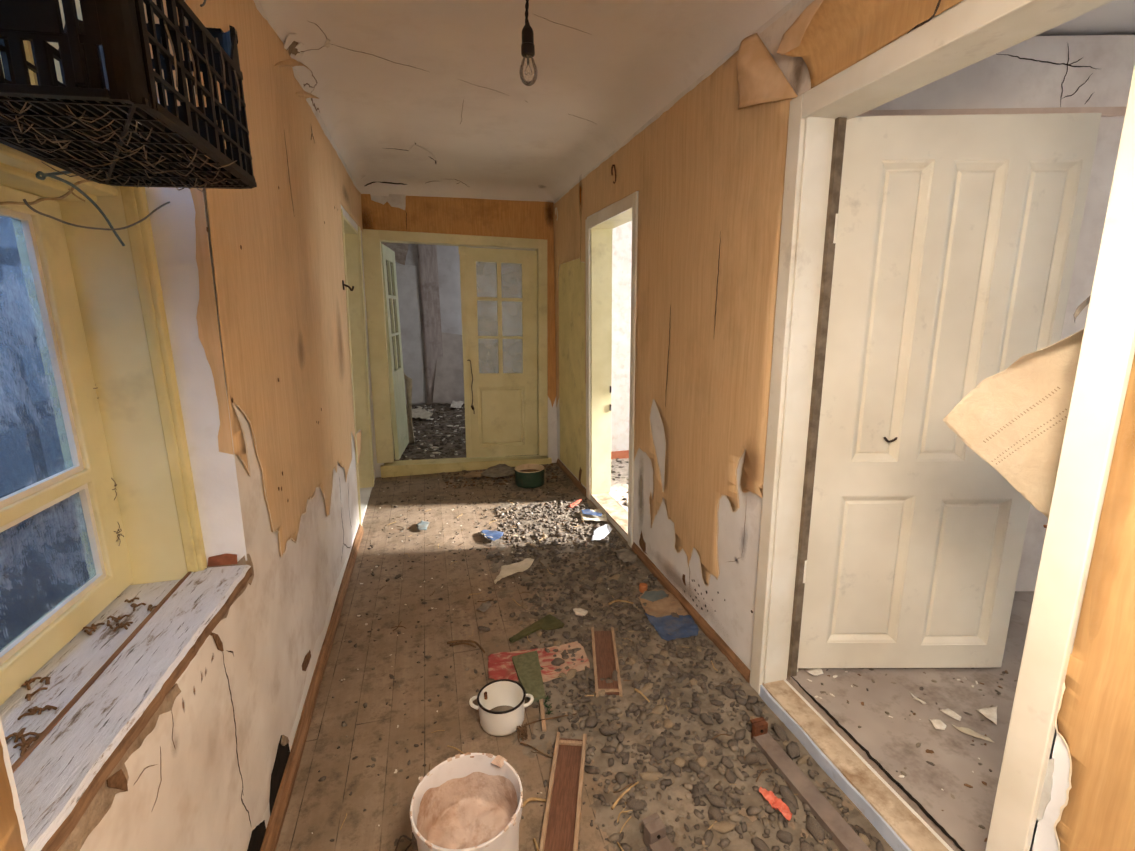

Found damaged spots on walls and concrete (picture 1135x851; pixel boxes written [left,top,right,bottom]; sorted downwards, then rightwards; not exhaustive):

peeling [737,0,824,109]
crack [997,46,1095,107]
peeling [57,187,362,851]
peeling [633,399,762,669]
peeling [0,717,28,848]
crack [222,651,251,824]
peeling [1030,683,1072,851]